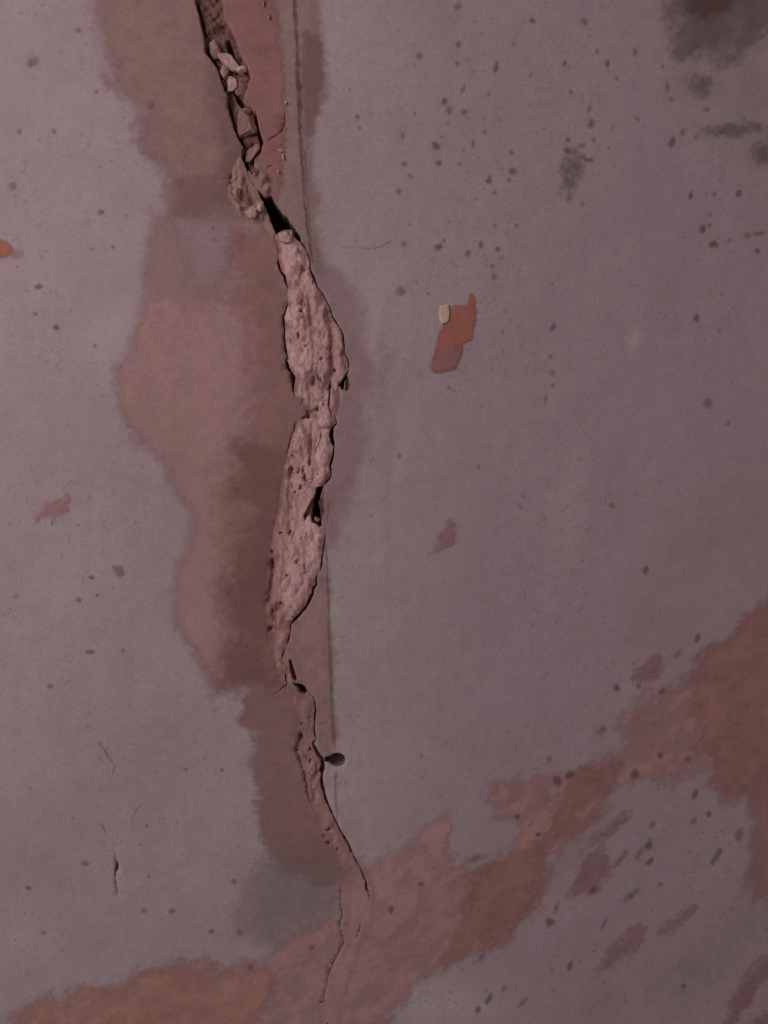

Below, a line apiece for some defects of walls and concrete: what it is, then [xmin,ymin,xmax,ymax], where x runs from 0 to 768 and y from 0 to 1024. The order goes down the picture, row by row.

leakage [99,0,353,885]
crack [195,0,317,286]
crack [283,316,296,388]
crack [289,375,350,801]
leakage [272,0,368,537]
peeling [430,294,477,372]